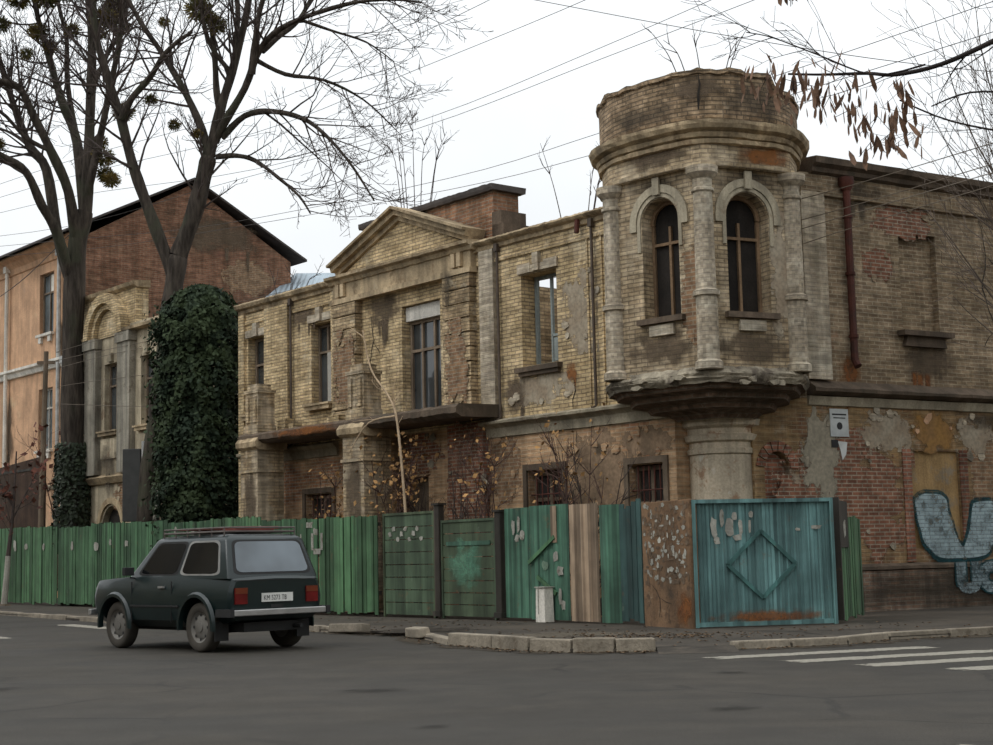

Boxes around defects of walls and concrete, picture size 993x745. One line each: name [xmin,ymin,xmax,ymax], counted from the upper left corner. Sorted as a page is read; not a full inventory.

peeling [508,371,575,407]
spalling [771,407,993,564]
corrosion [732,611,819,621]